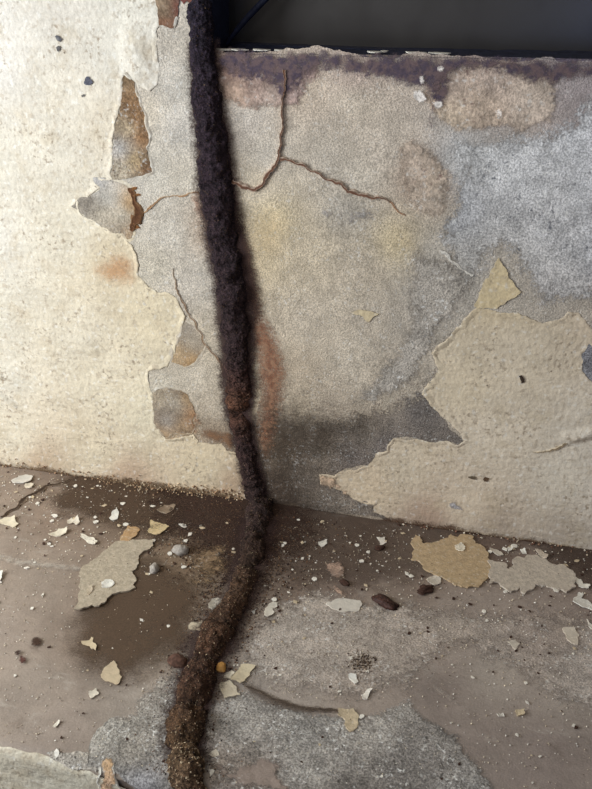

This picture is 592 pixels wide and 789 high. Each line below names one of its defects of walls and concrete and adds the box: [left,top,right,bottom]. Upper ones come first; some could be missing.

crack [232,70,406,216]
leakage [217,49,592,118]
peeling [69,0,236,455]
corrosion [240,227,286,451]
peeling [216,45,592,655]
corrosion [194,414,232,447]
crack [1,476,79,518]
leakage [52,475,188,546]
leakage [71,557,204,682]
spalling [47,669,182,789]
crack [244,686,338,714]
spalling [202,664,492,789]